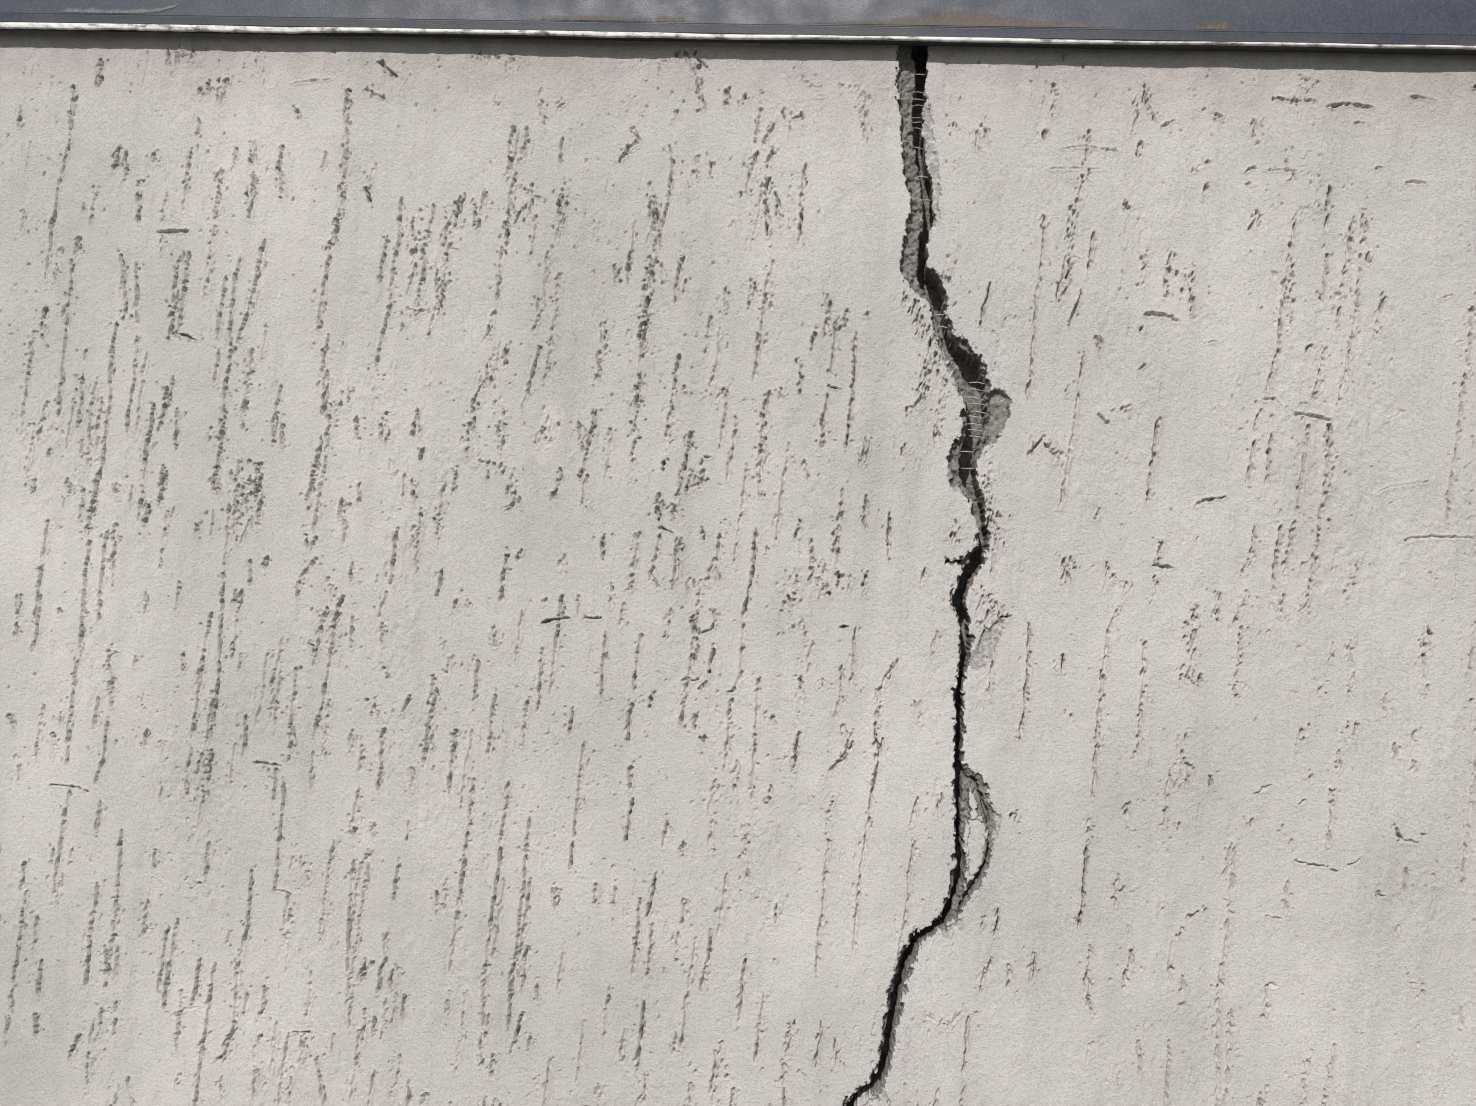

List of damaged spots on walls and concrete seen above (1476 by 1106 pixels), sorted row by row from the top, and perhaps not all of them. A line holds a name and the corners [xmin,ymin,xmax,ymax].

crack [843,45,1013,1106]